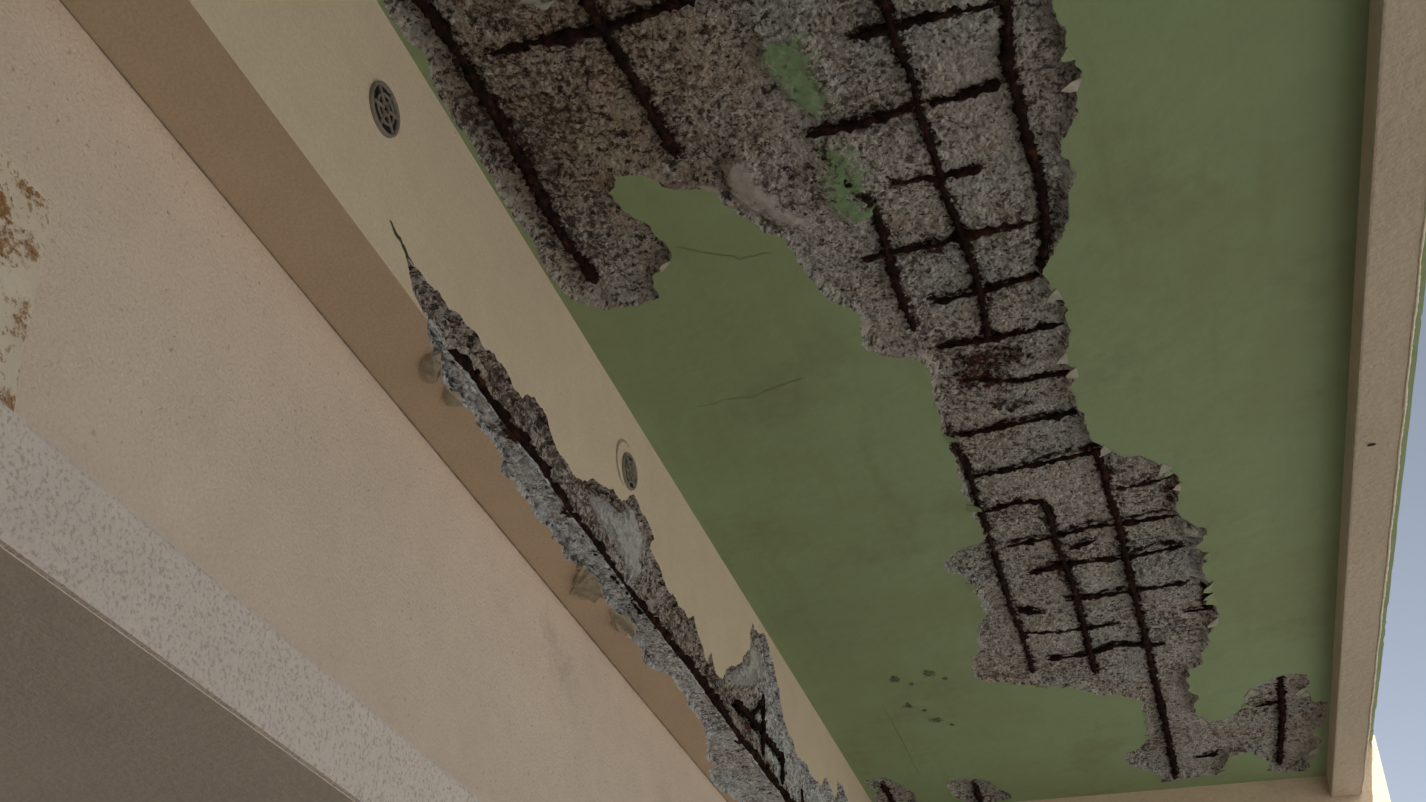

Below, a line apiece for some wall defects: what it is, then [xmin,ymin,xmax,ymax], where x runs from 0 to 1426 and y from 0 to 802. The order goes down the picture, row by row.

rust [0,170,47,267]
rust [0,378,16,412]
spalling [384,0,1328,802]